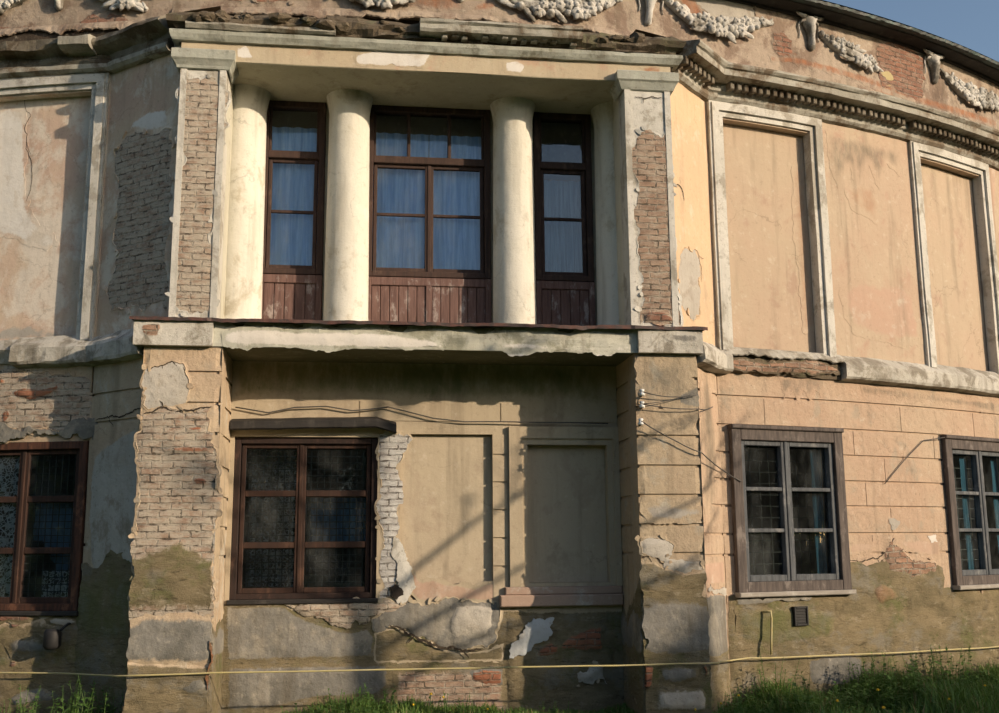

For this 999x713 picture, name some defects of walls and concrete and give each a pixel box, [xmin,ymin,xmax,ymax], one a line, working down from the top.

spalling [366,19,420,36]
spalling [597,32,645,43]
crack [24,100,32,201]
flaking render [102,73,231,339]
flaking render [632,126,702,346]
peeling [221,326,447,353]
peeling [495,340,634,357]
flaking render [0,366,94,439]
flaking render [86,359,223,614]
spalling [284,536,620,713]
peeling [634,498,728,678]
peeling [849,518,941,577]